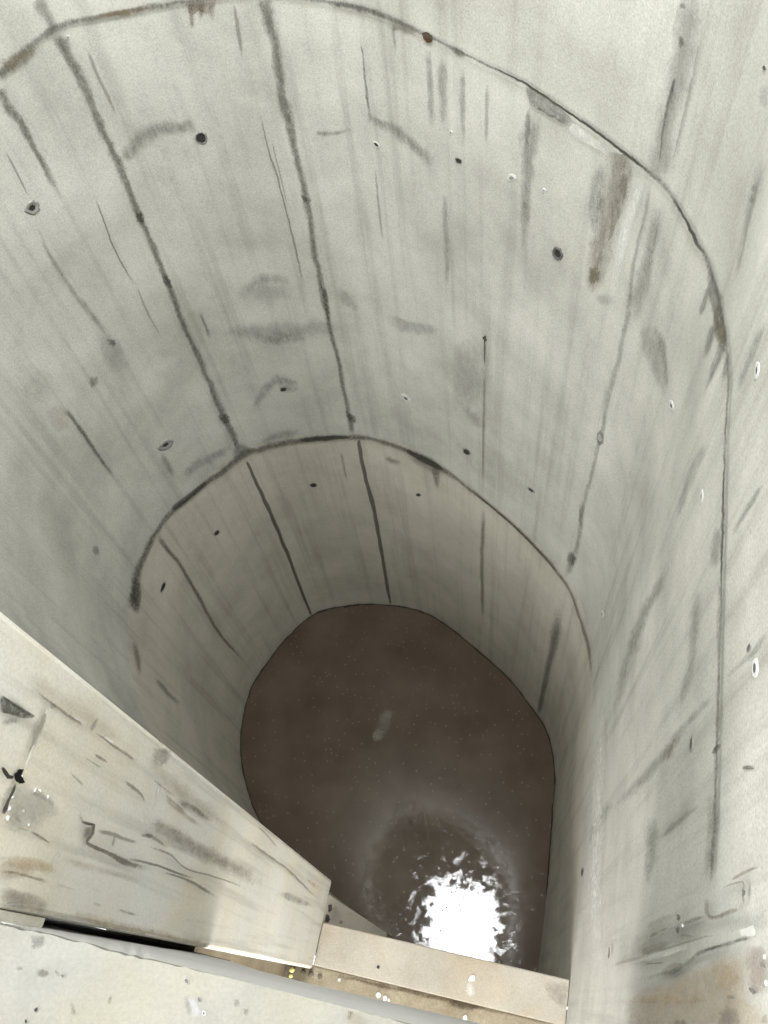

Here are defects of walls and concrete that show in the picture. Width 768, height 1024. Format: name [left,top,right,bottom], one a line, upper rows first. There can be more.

crack [99,209,126,270]
crack [264,131,299,263]